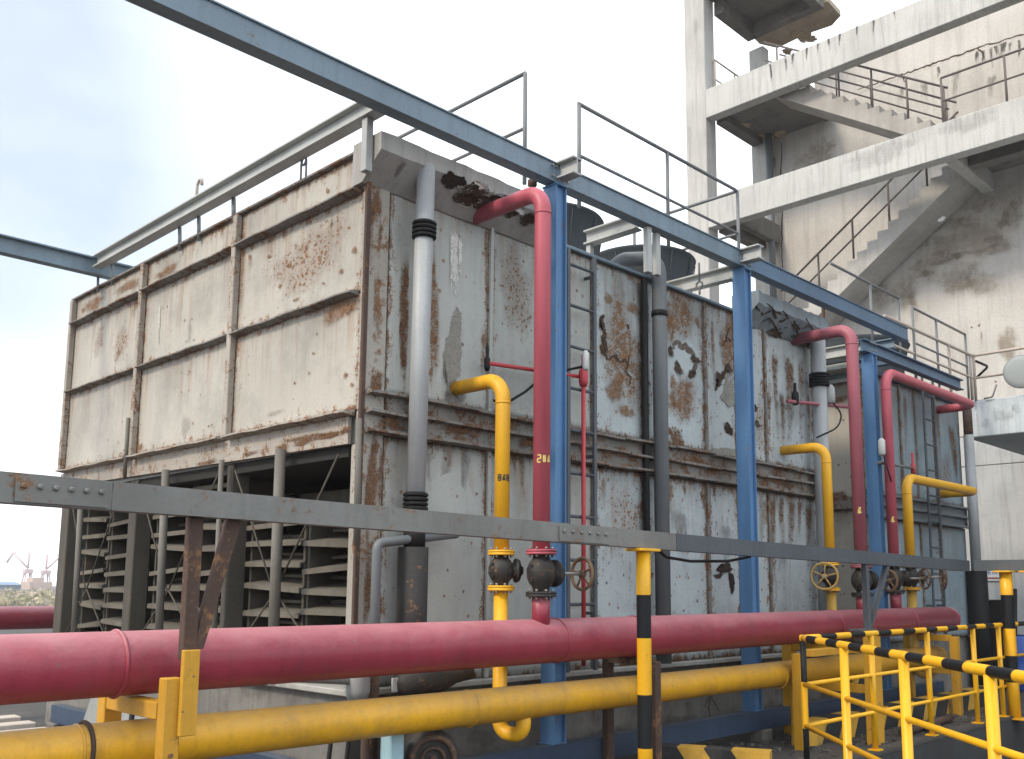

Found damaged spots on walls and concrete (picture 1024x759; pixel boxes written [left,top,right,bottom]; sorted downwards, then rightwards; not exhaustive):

corrosion [260,213,350,301]
peeling [452,180,507,209]
peeling [501,207,535,226]
peeling [443,308,463,402]
crack [608,353,632,385]
corrosion [602,293,650,416]
peeling [668,340,703,379]
corrosion [667,292,733,375]
peeling [715,363,735,407]
peeling [756,303,814,348]
corrosion [362,416,404,506]
corrosion [363,531,379,624]